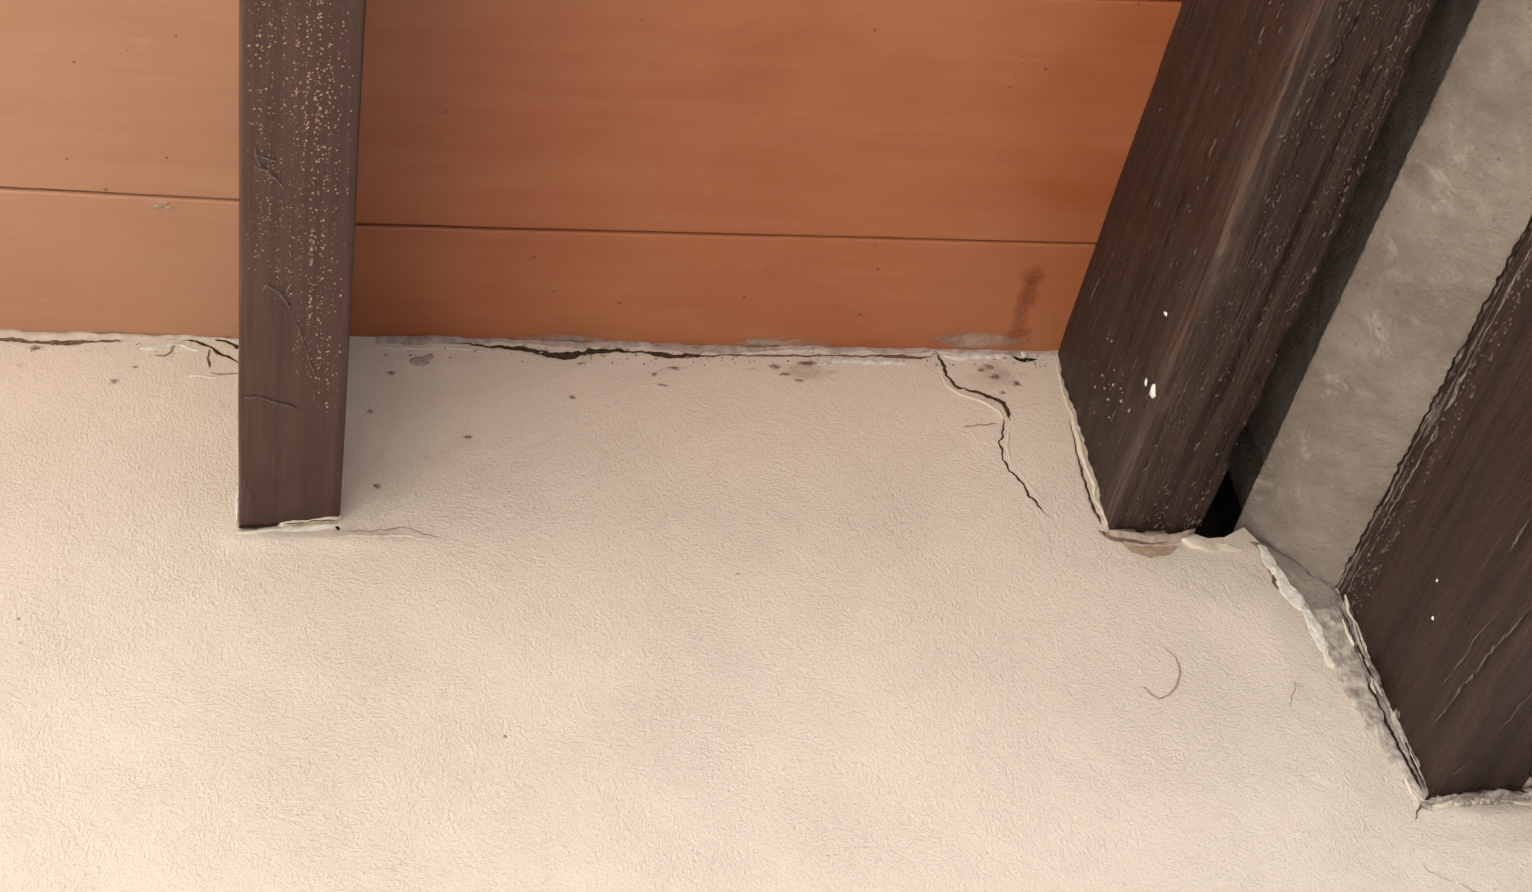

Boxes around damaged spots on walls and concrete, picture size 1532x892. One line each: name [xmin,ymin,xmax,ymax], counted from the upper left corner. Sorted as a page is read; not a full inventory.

crack [455,343,1048,516]
peeling [375,0,1532,811]